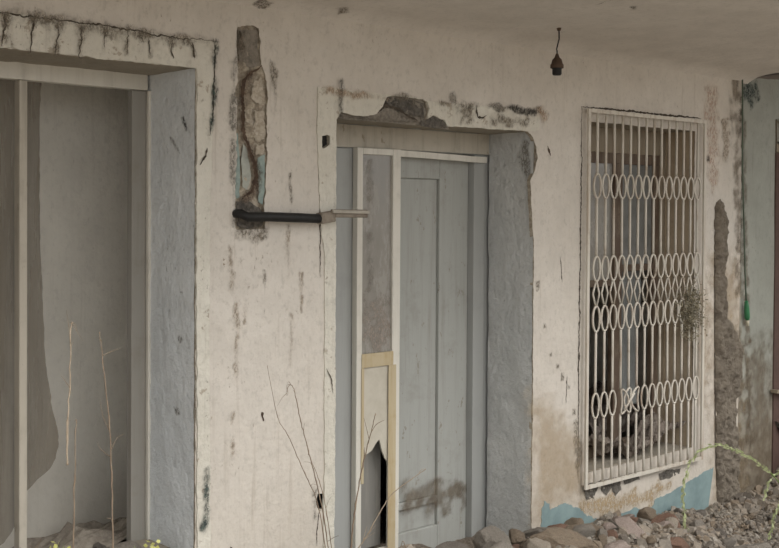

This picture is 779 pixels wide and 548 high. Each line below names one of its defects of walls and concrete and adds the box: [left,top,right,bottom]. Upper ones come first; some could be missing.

flaking render [235,26,266,230]
spalling [385,97,447,128]
peeling [541,467,714,527]